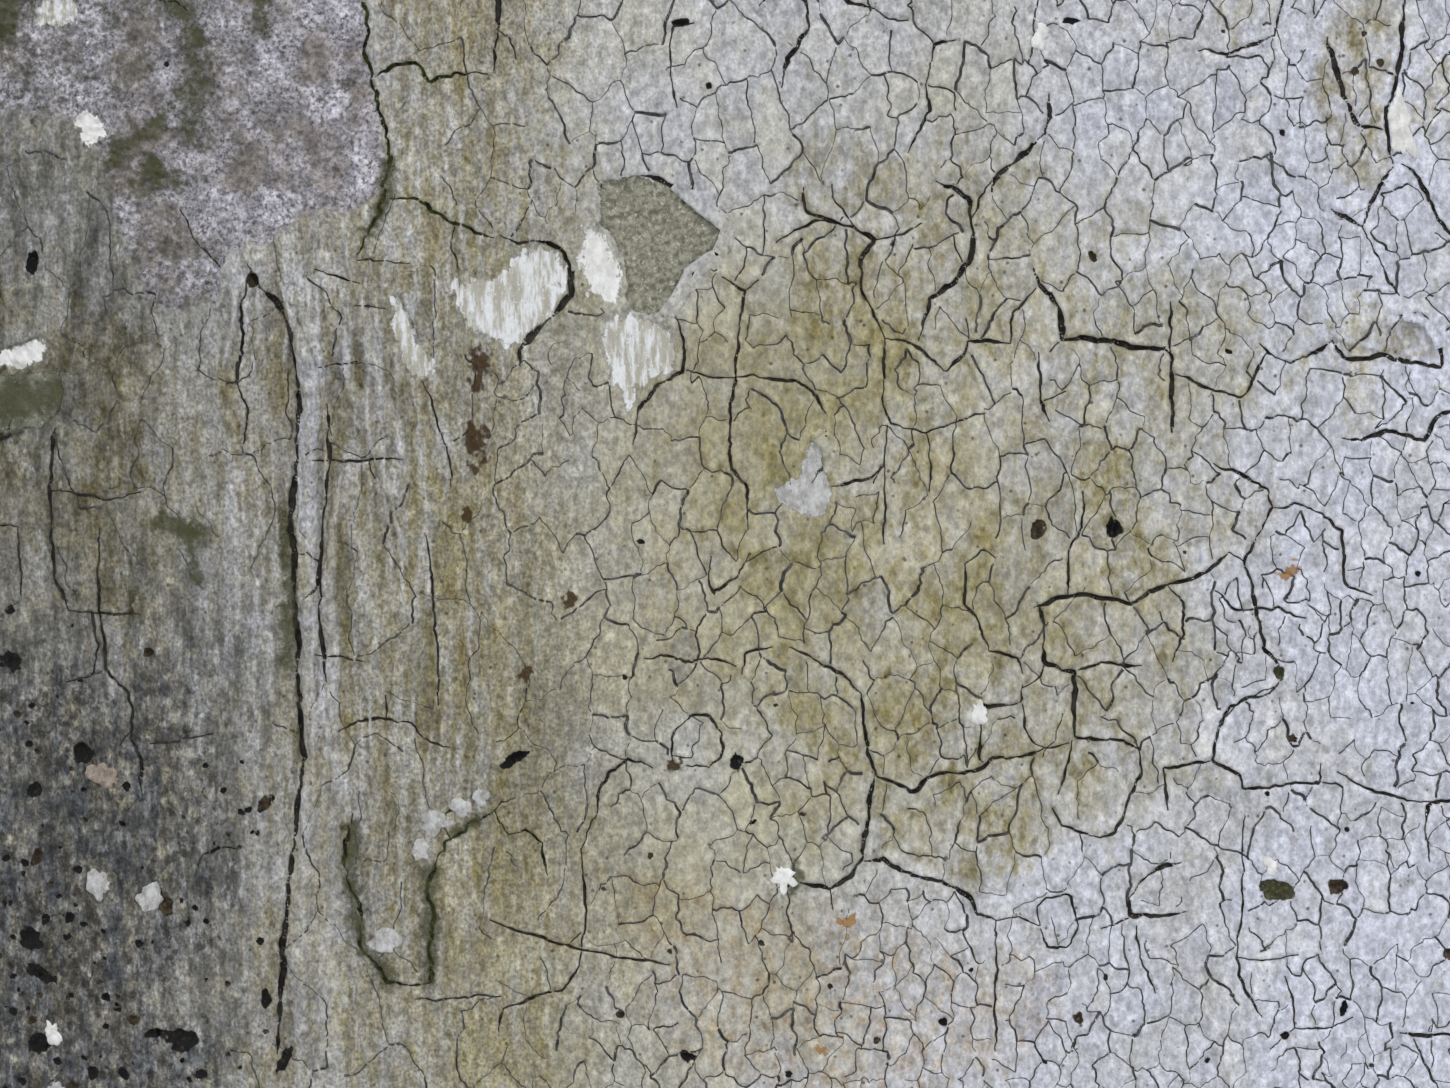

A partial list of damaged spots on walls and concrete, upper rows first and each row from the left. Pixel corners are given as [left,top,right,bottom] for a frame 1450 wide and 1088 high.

peeling [34,0,78,29]
peeling [73,109,109,147]
spalling [447,176,737,412]
crack [197,230,548,1088]
peeling [774,427,840,518]
crack [355,0,1450,1088]